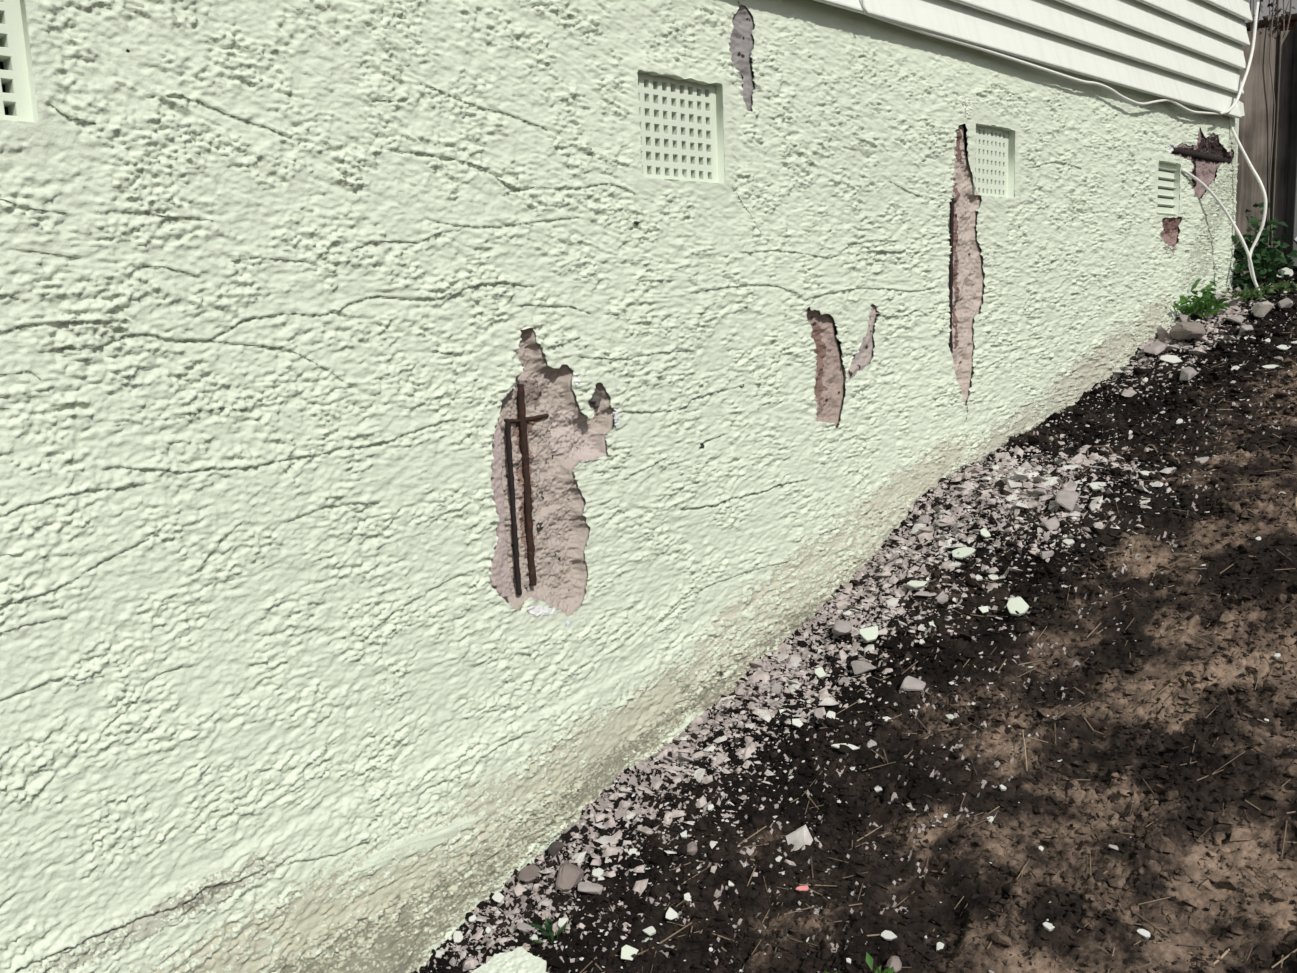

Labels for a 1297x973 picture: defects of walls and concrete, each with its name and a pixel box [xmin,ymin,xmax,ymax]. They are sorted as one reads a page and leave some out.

crack [151,95,284,135]
crack [0,283,591,382]
crack [375,84,547,130]
crack [360,151,635,247]
crack [706,284,937,318]
crack [732,187,926,259]
spalling [805,304,880,426]
spalling [948,124,984,403]
spalling [1165,128,1234,198]
spalling [489,328,620,626]
peeling [646,412,1203,826]
peeling [435,775,718,961]